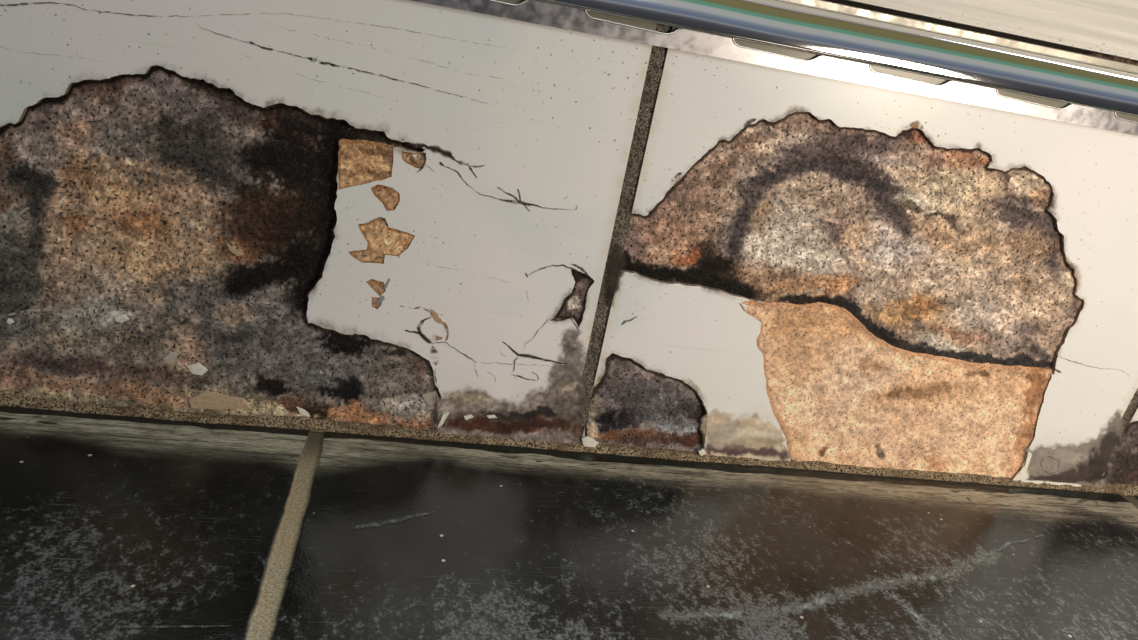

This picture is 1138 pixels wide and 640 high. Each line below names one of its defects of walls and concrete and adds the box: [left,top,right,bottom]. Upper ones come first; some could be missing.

crack [0,2,506,103]
crack [418,152,577,211]
spalling [0,65,485,429]
spalling [623,109,1082,373]
crack [399,305,570,381]
spalling [582,353,706,456]
spalling [1104,421,1138,485]